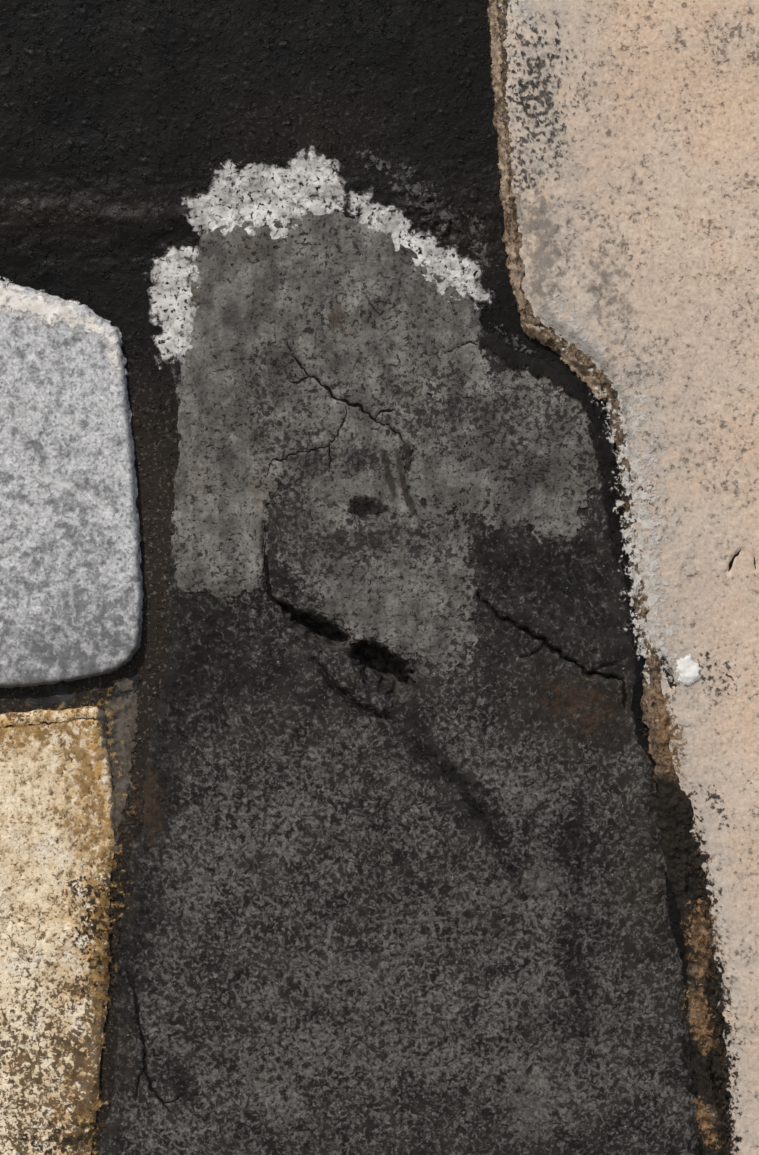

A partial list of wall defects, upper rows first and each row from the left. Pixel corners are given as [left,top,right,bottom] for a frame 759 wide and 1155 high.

crack [265,341,404,476]
crack [262,523,286,607]
crack [477,593,628,709]
crack [128,973,186,1120]